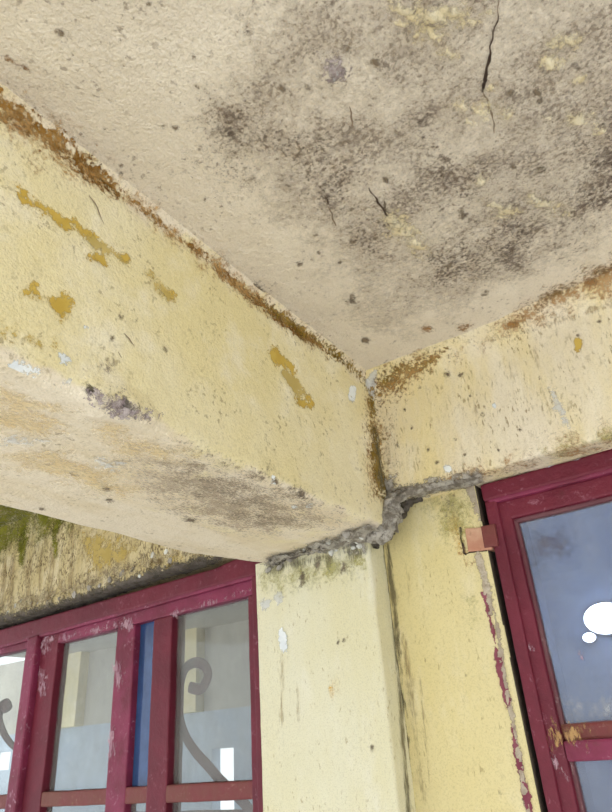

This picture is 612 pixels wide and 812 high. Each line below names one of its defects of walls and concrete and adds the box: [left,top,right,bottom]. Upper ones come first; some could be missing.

crack [482,0,499,132]
peeling [17,185,131,267]
corrosion [0,87,344,360]
crack [369,188,388,217]
peeling [23,280,75,321]
water stain [494,264,612,332]
peeling [269,345,315,410]
water stain [327,347,450,502]
spalling [260,464,484,573]
water stain [383,544,400,669]
water stain [398,684,410,812]
peeling [548,716,588,770]